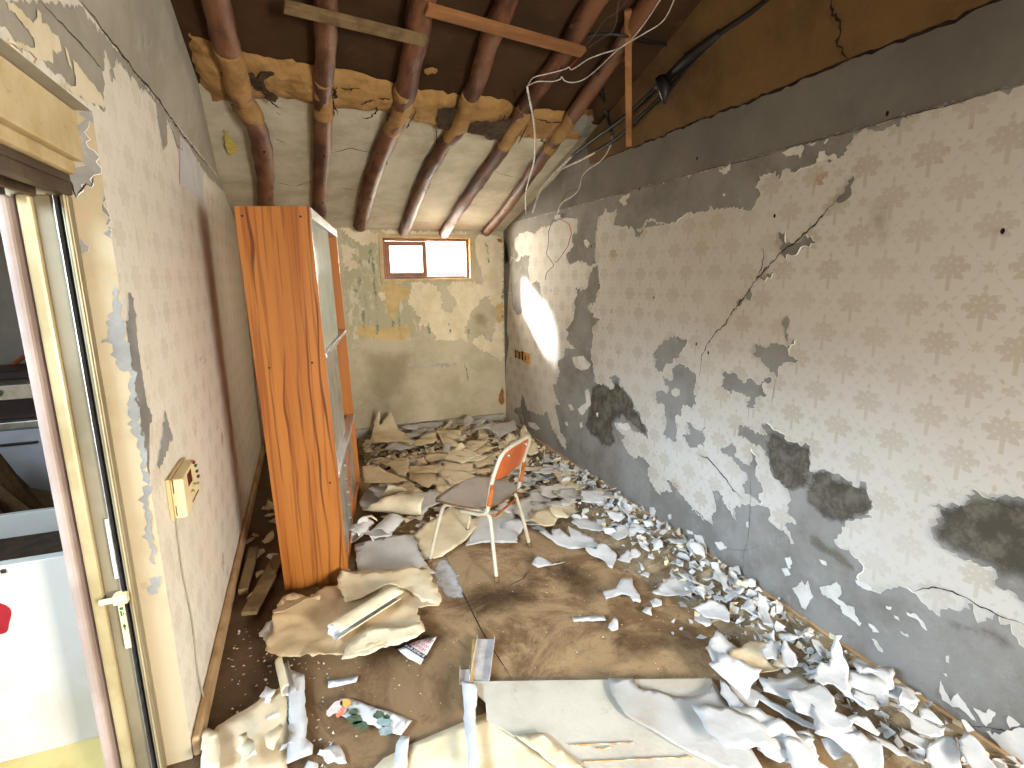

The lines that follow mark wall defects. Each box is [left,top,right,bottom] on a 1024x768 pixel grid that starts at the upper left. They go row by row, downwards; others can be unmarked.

peeling [8,2,107,109]
crack [830,0,848,63]
peeling [783,138,837,162]
peeling [340,228,505,363]
crack [699,175,855,376]
peeling [565,389,598,428]
leakage [586,383,645,445]
leakage [768,434,872,521]
leakage [938,499,1024,573]
peeling [782,557,883,652]
crack [917,586,1021,623]
peeling [939,656,1024,763]